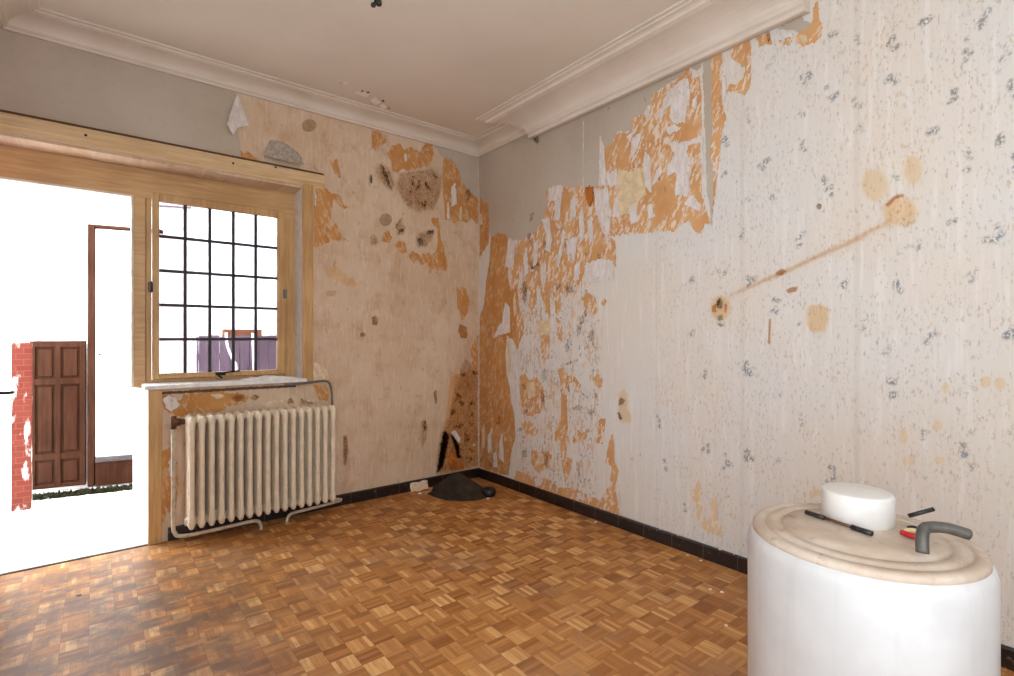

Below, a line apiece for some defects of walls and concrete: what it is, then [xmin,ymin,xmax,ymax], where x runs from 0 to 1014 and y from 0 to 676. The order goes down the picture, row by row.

flaking render [435,58,727,408]
peeling [162,391,249,417]
peeling [261,385,330,410]
peeling [481,421,507,468]